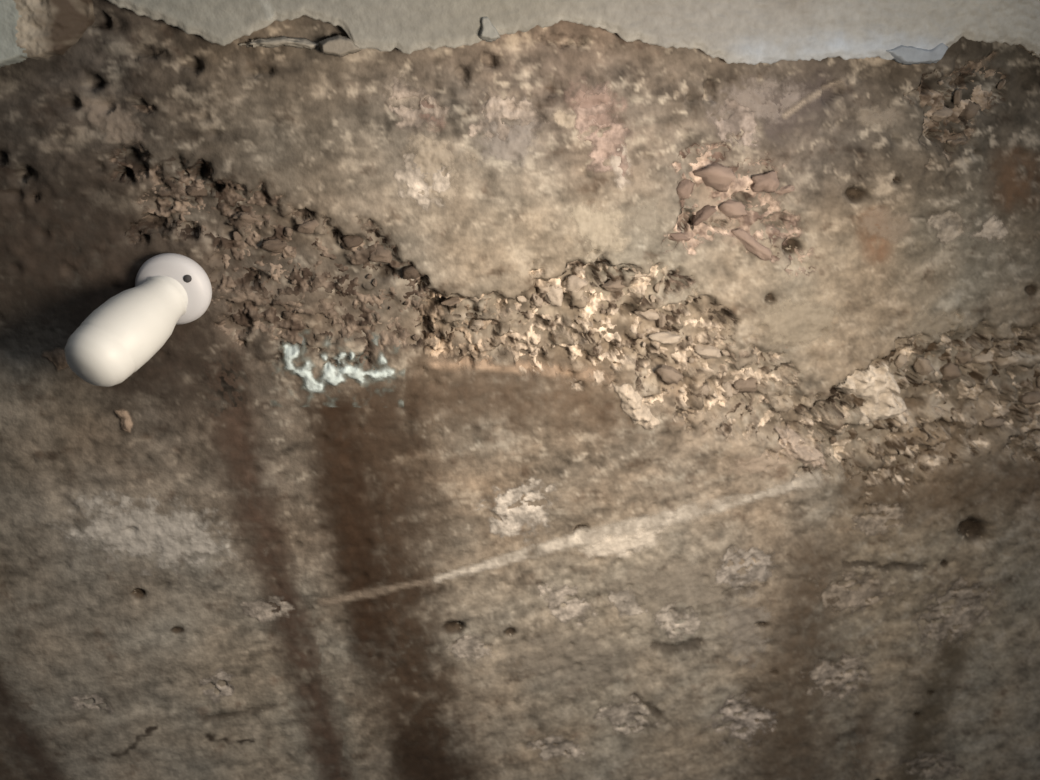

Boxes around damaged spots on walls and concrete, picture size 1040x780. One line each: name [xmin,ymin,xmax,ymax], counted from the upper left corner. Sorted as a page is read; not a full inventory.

flaking render [239,34,362,58]
flaking render [886,43,948,65]
spalling [389,77,449,129]
spalling [469,94,547,140]
spalling [574,83,631,176]
spalling [707,99,757,146]
spalling [394,153,450,210]
spalling [928,210,1008,244]
damp [67,495,229,566]
damp [215,364,348,780]
damp [283,344,475,780]
damp [765,554,827,780]